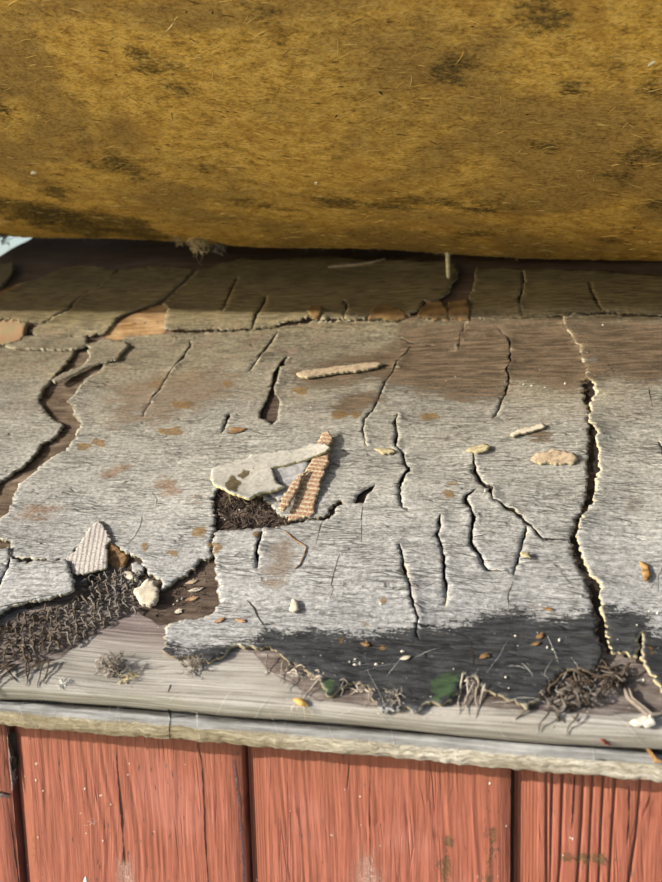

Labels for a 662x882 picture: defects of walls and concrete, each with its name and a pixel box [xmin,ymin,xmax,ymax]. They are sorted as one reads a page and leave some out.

peeling [0,305,167,518]
crack [31,299,302,544]
peeling [261,361,285,424]
peeling [210,443,342,534]
crack [174,276,662,668]
crack [0,520,83,611]
peeling [0,542,218,670]
peeling [254,648,377,706]
peeling [426,653,662,715]
leakage [436,835,453,882]